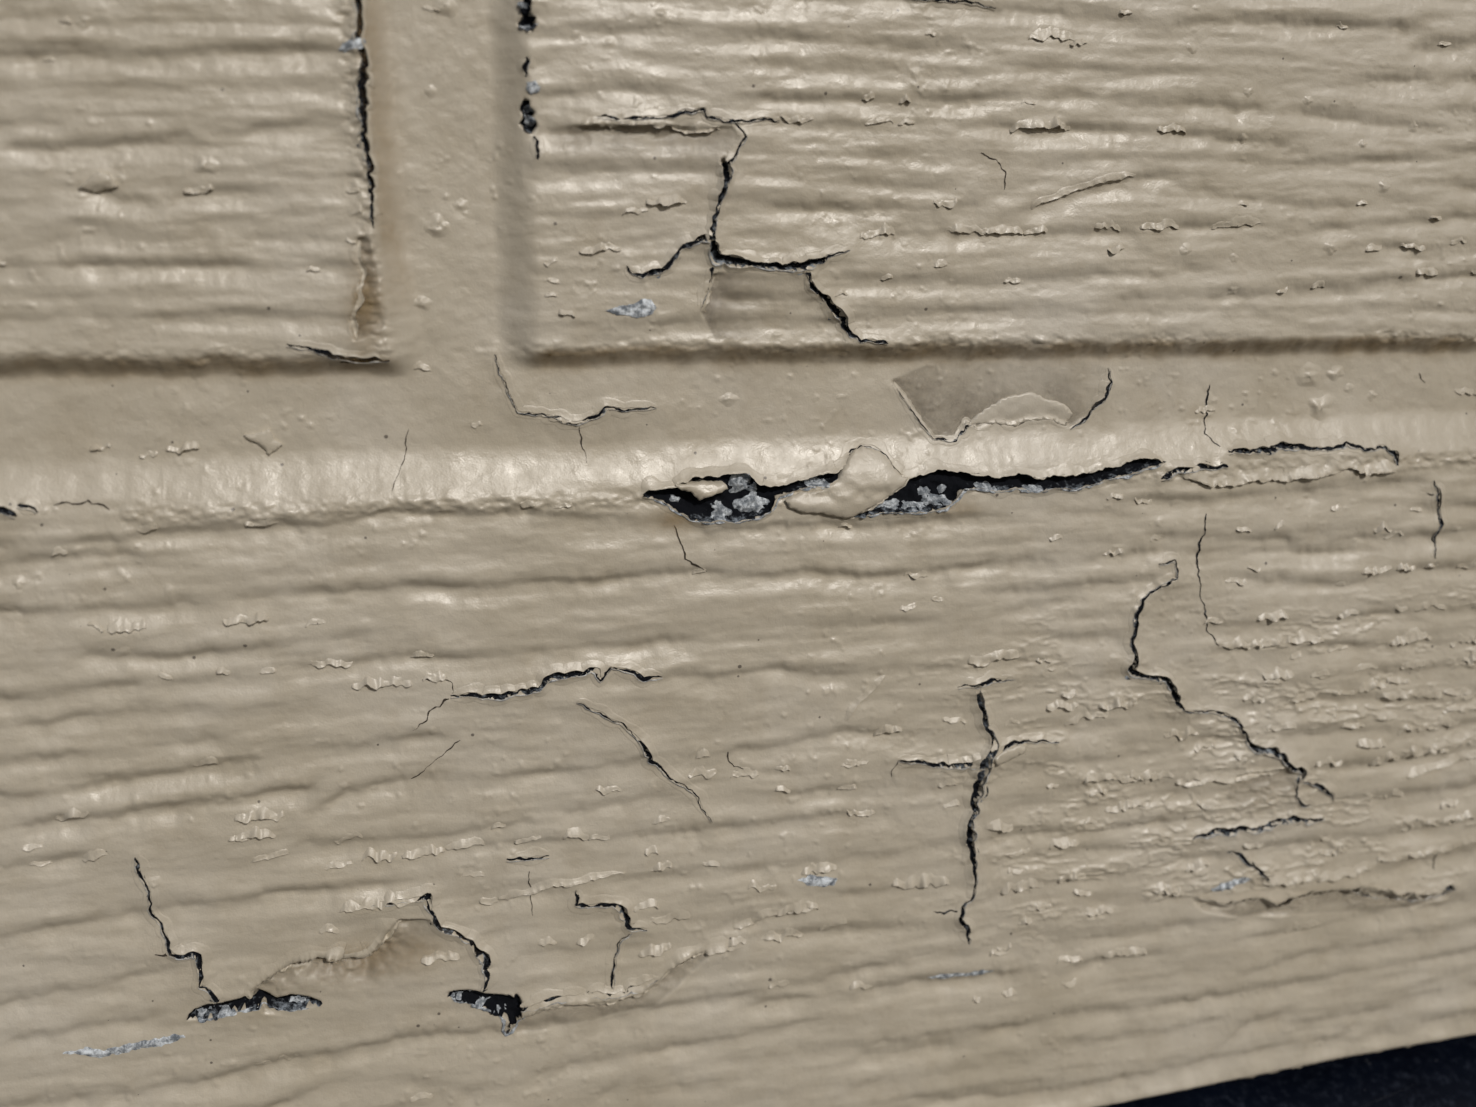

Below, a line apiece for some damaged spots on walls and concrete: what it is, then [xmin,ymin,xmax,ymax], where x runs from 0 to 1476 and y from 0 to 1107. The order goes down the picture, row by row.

crack [597,100,889,350]
spalling [640,379,1166,529]
crack [1160,386,1402,482]
crack [344,846,657,1013]
crack [411,660,715,824]
crack [891,670,1060,945]
peeling [995,744,1027,767]
peeling [1049,753,1286,850]
crack [1120,514,1338,883]
peeling [1152,798,1476,915]
peeling [1219,609,1410,703]
peeling [1340,711,1476,779]